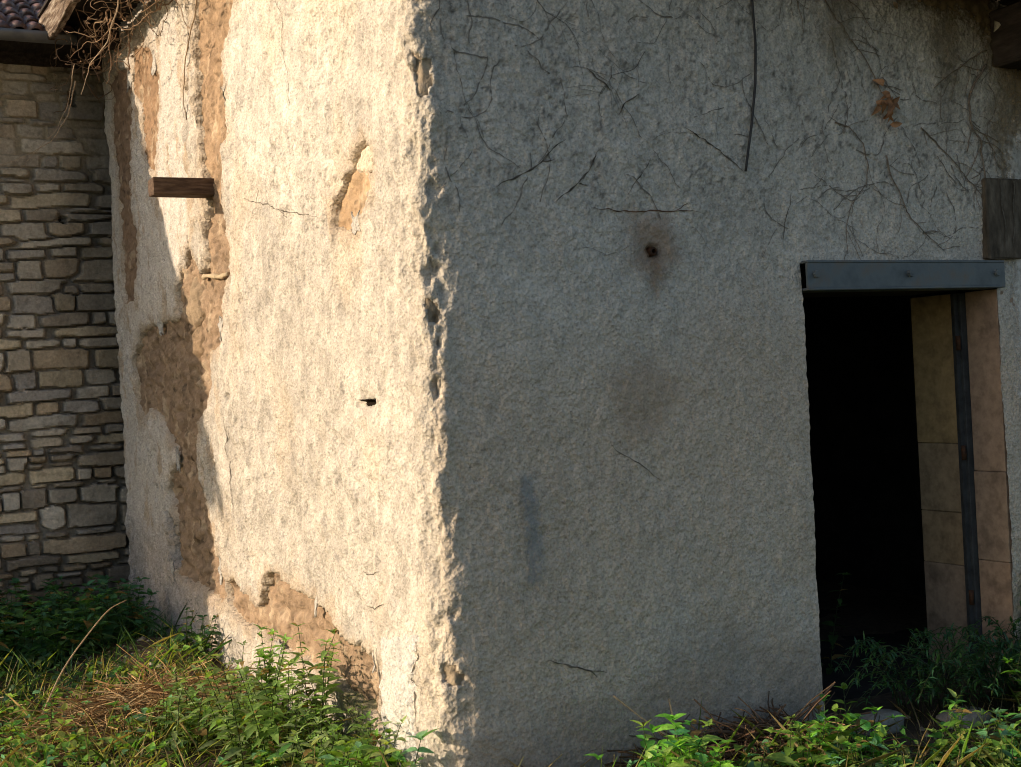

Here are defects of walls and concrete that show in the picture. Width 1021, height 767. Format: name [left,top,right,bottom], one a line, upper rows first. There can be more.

flaking render [111,46,159,304]
spalling [413,52,433,98]
flaking render [136,0,380,711]